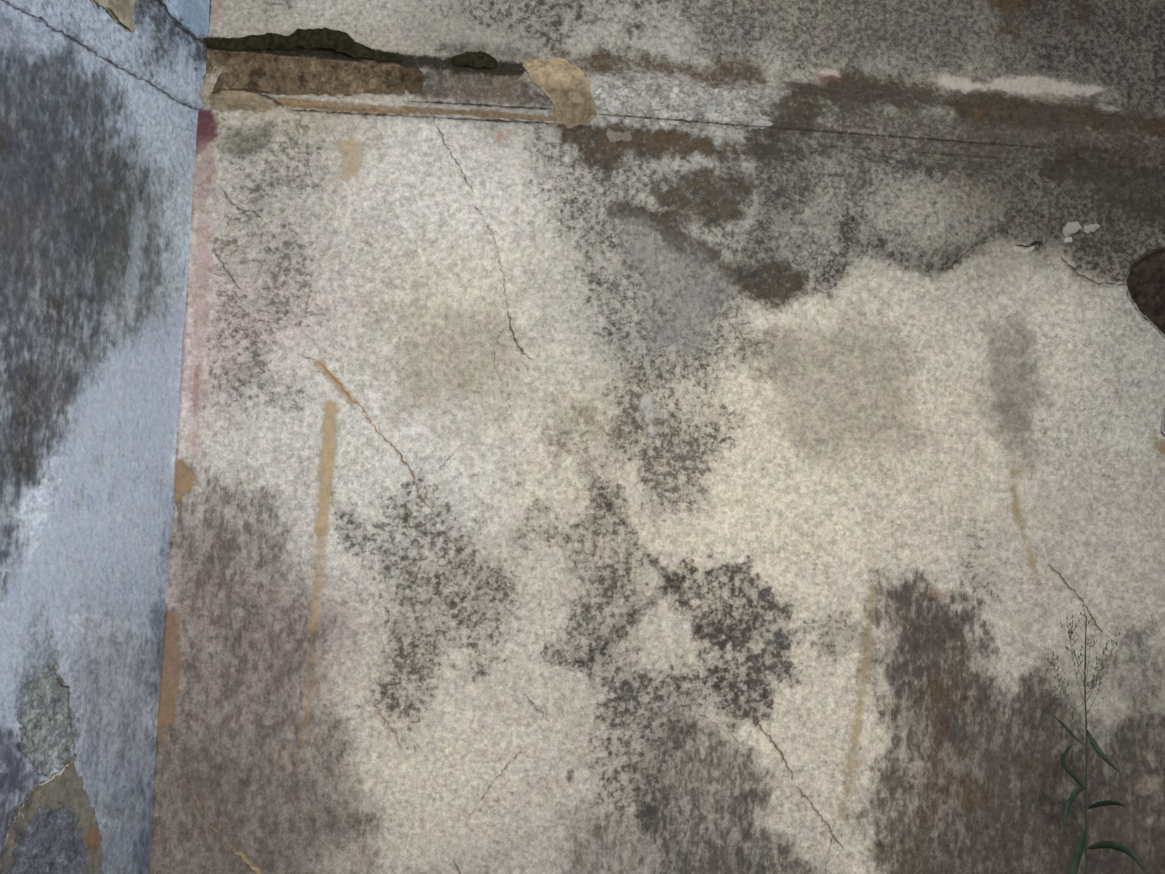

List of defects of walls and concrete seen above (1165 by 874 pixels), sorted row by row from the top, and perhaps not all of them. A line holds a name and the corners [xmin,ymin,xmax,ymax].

flaking render [91,0,137,32]
flaking render [199,49,427,114]
crack [293,101,554,359]
damp [229,0,1165,511]
flaking render [1124,246,1165,337]
damp [0,17,373,874]
rust [315,360,353,558]
crack [302,355,449,508]
flaking render [0,602,104,874]
damp [335,479,513,730]
damp [518,476,1165,874]